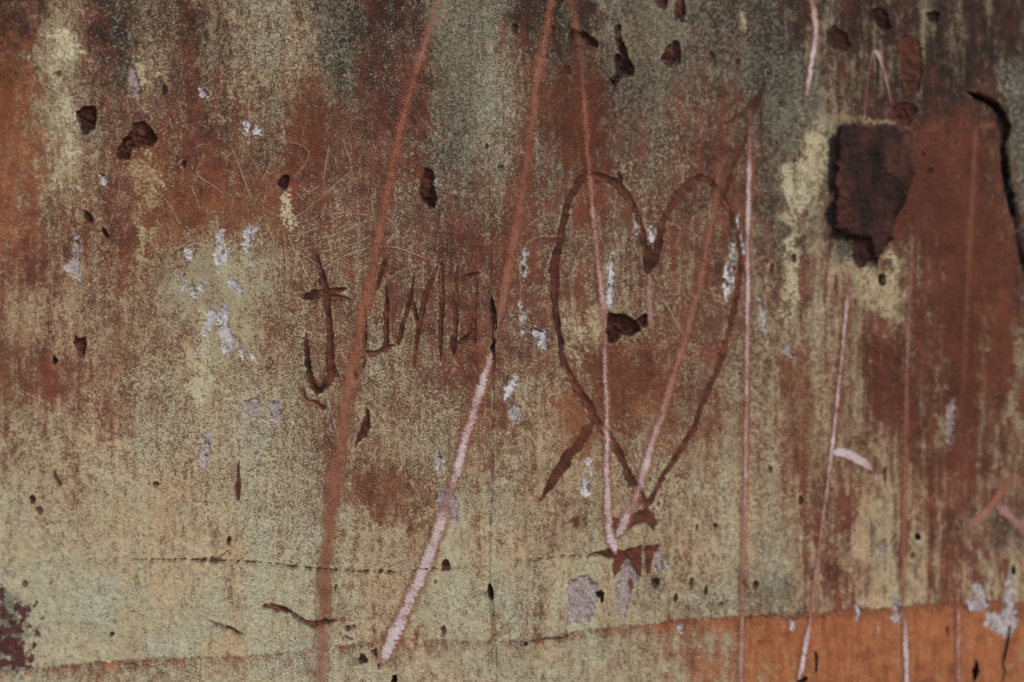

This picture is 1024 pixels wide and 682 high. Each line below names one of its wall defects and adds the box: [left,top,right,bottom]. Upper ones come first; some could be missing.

spalling [76,105,97,135]
spalling [116,121,157,160]
crack [967,93,1024,275]
spalling [605,252,648,344]
peeling [612,489,660,531]
peeling [565,545,669,626]
peeling [0,587,44,672]